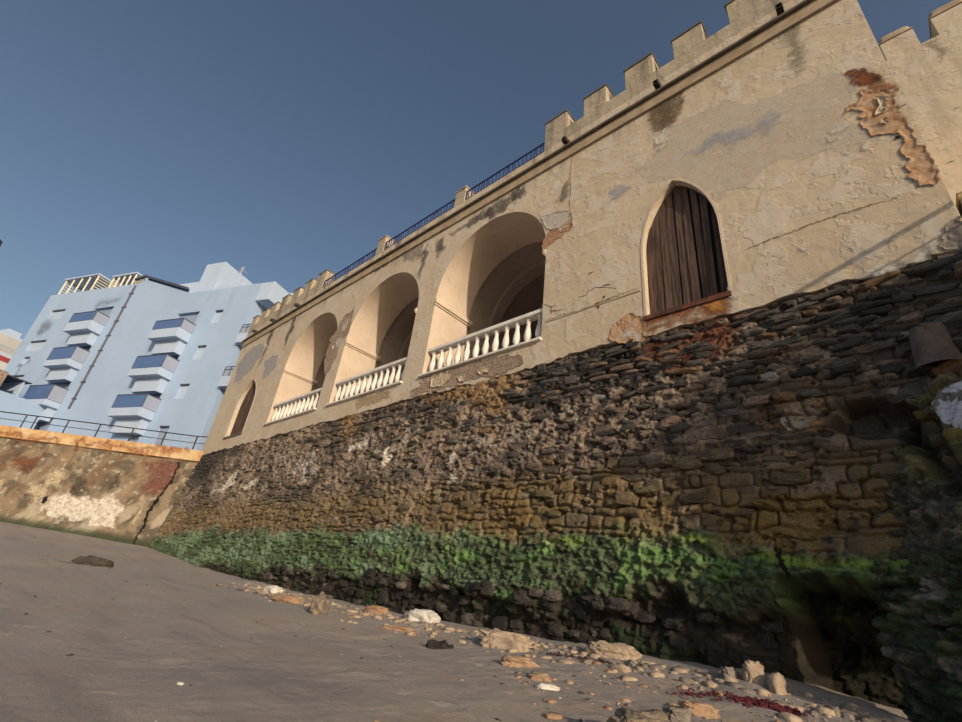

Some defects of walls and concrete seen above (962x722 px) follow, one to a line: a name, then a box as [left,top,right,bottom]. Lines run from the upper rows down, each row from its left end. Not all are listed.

leakage [648,91,684,132]
spalling [844,88,940,186]
flaking render [541,210,573,251]
crack [749,197,898,249]
spalling [609,313,649,347]